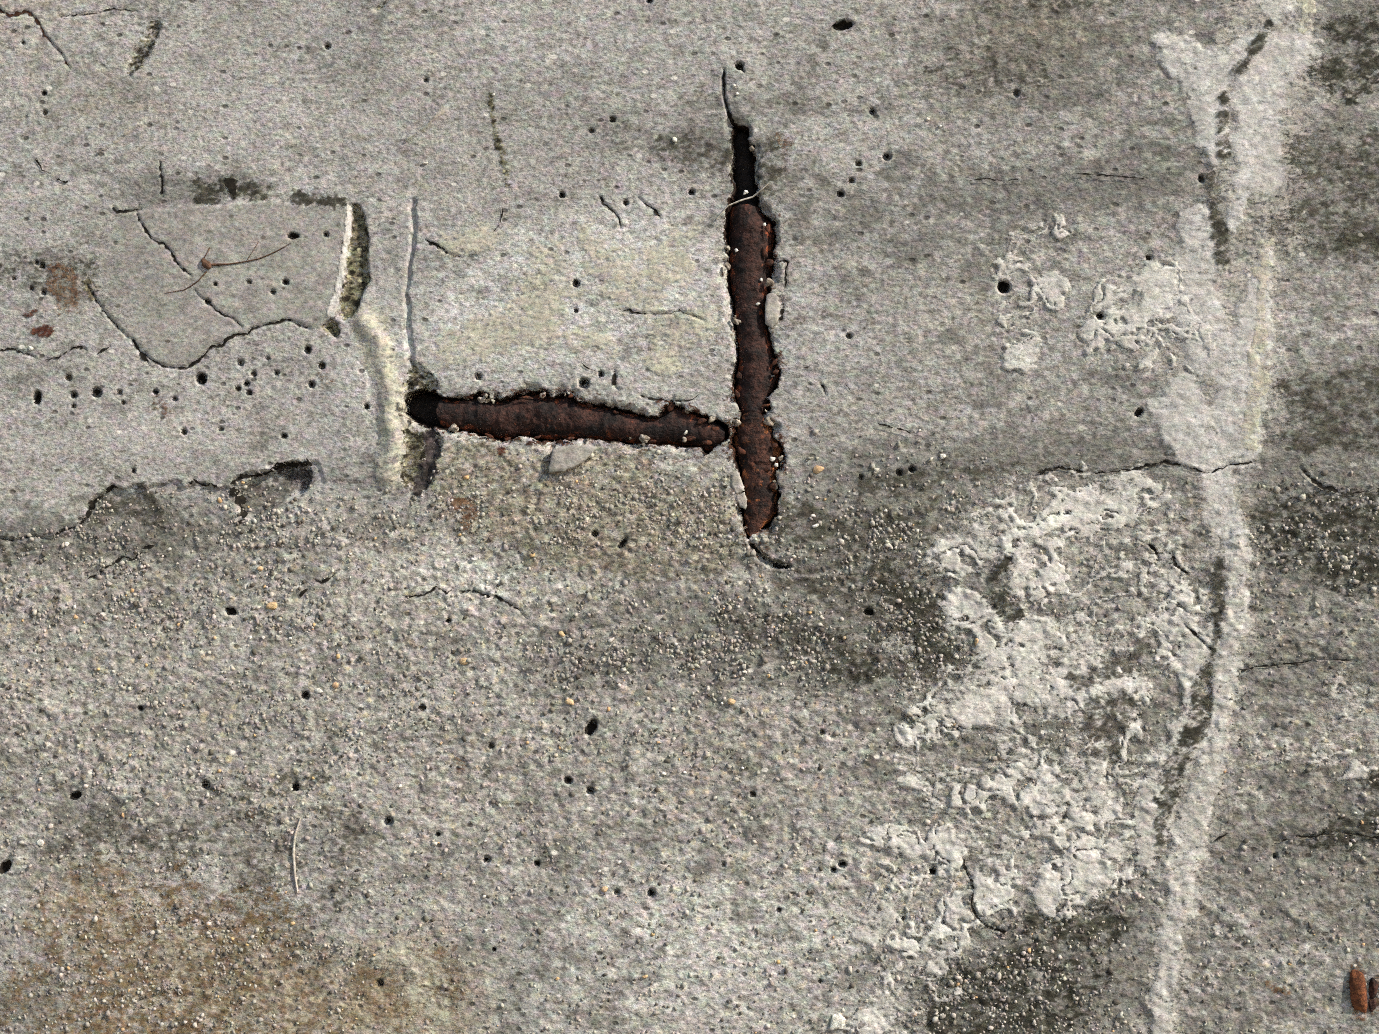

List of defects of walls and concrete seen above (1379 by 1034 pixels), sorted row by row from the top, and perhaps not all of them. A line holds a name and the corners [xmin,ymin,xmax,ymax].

crack [0,161,307,369]
rust [433,429,595,455]
rust [443,385,631,409]
rust [620,376,741,462]
crack [188,458,312,526]
rust [450,497,477,531]
leakage [715,0,1379,1034]